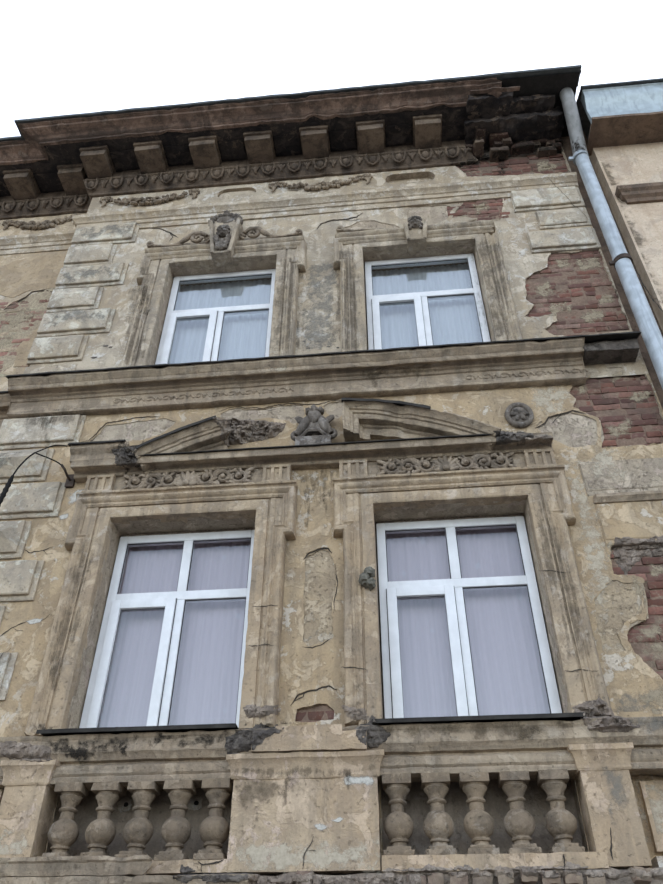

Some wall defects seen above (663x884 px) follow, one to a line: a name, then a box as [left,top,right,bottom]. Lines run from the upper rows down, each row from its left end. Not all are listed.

flaking render [457,153,569,177]
flaking render [344,198,510,229]
crack [0,289,53,310]
flaking render [524,250,629,336]
flaking render [0,288,55,378]
crack [81,413,160,442]
flaking render [537,367,663,479]
flaking render [594,547,663,714]
crack [289,667,363,706]
flaking render [293,703,334,726]